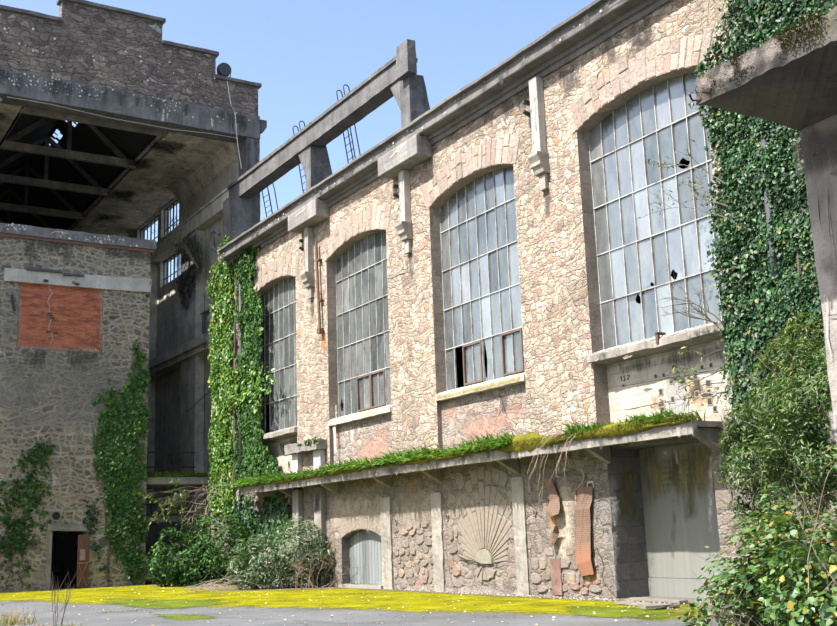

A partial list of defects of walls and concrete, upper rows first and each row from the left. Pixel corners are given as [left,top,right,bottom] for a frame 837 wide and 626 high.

crack [44,285,57,350]
corrosion [542,477,560,546]
corrosion [574,486,595,586]